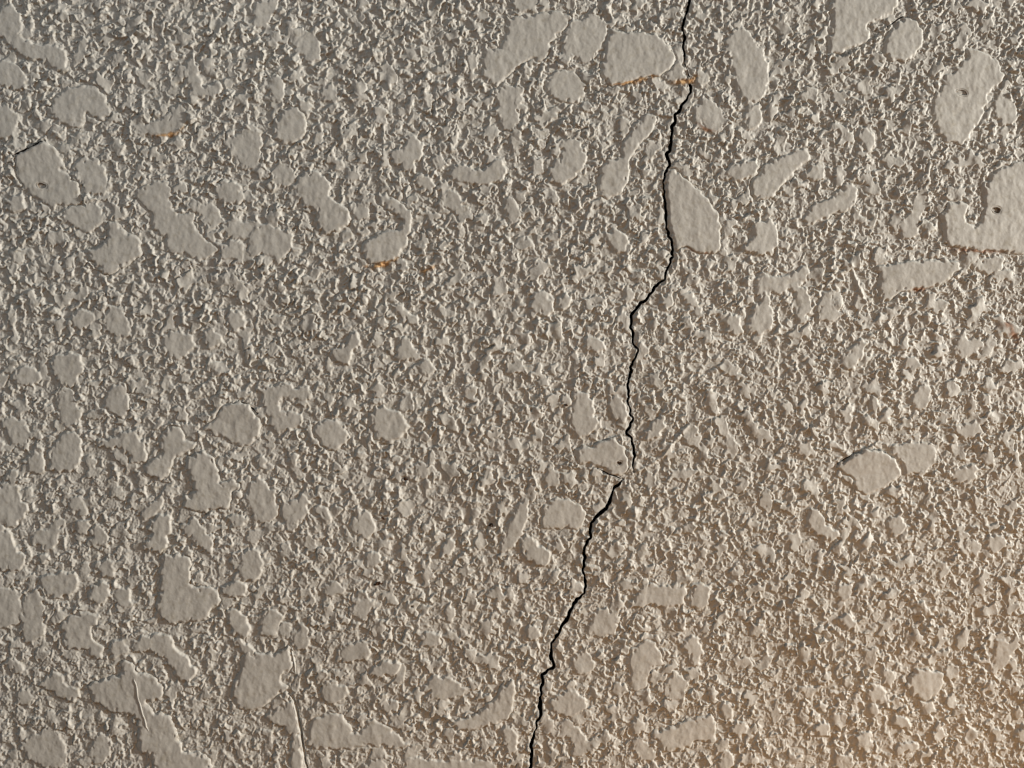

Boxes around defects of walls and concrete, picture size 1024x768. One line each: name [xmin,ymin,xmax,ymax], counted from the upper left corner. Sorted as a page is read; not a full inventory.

crack [526,0,693,768]